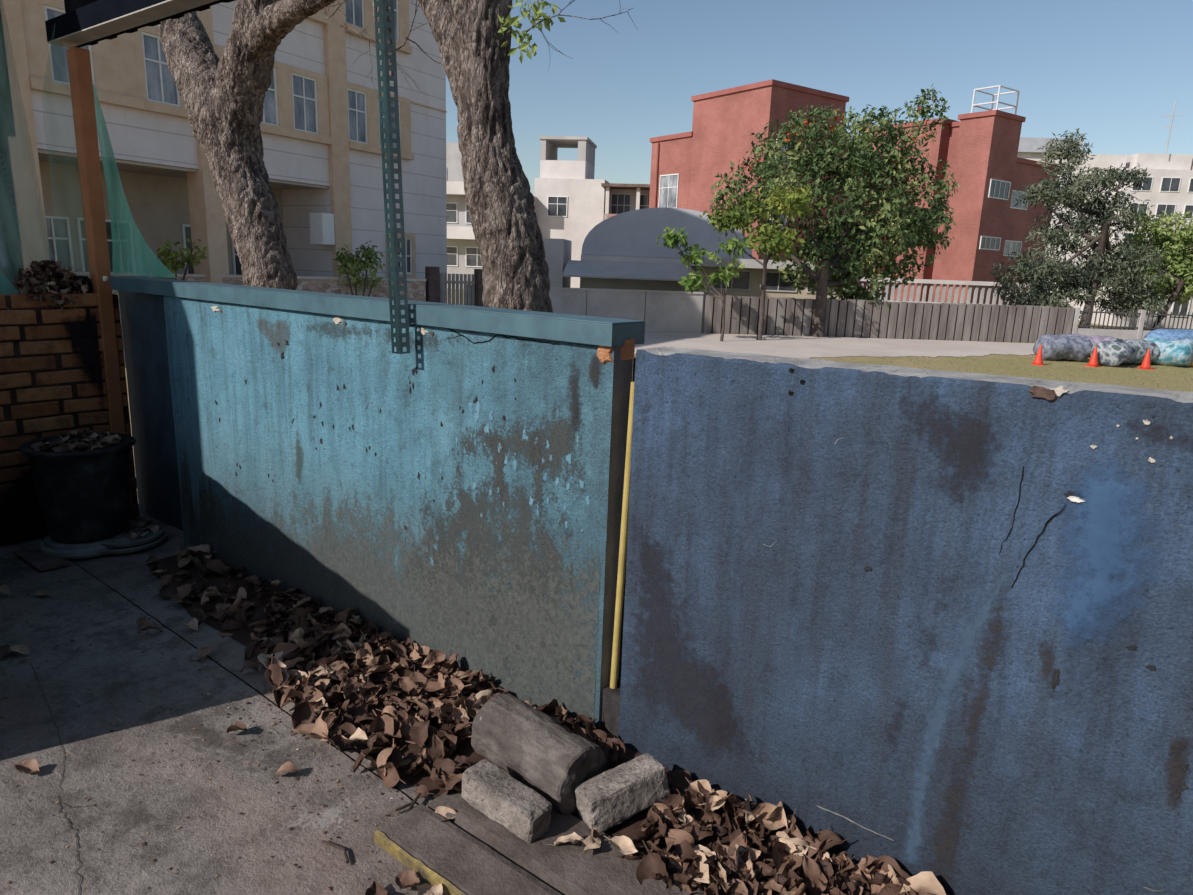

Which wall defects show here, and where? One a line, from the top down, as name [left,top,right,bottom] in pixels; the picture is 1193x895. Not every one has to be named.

water stain [186,357,600,720]
crack [999,466,1066,588]
crack [14,663,97,895]